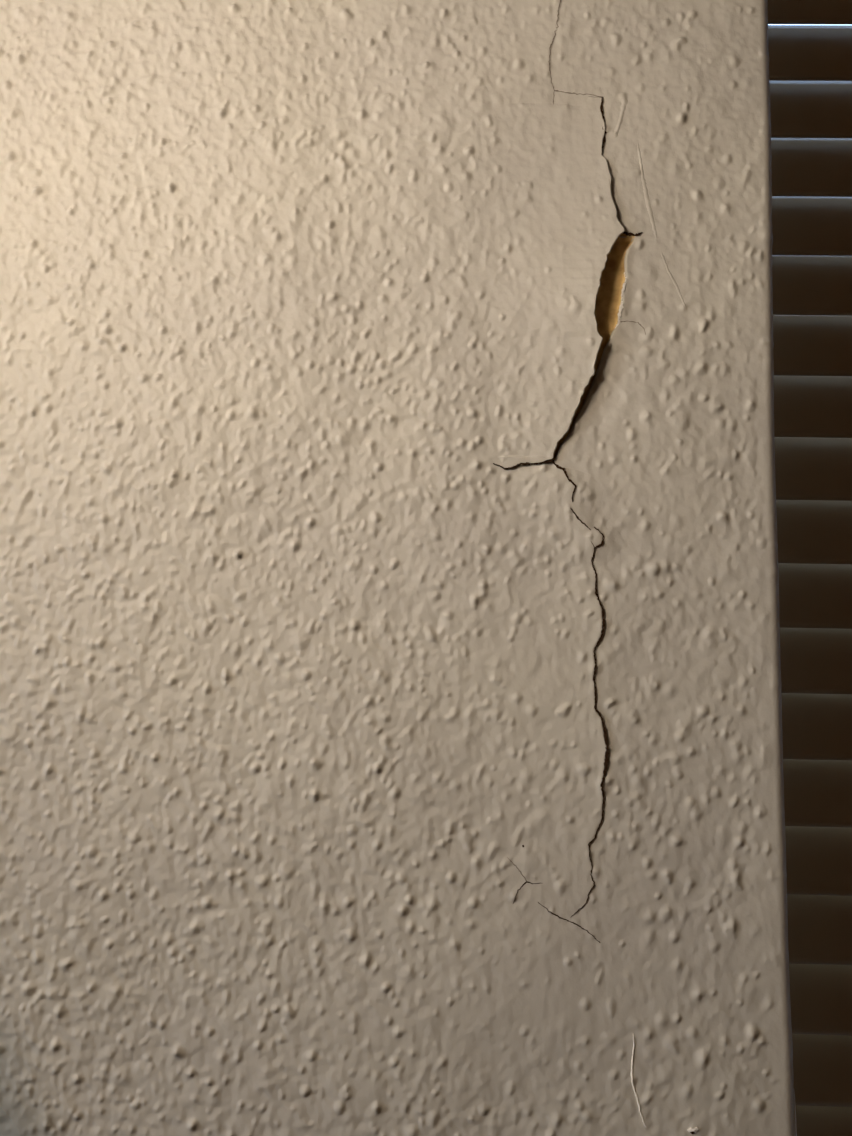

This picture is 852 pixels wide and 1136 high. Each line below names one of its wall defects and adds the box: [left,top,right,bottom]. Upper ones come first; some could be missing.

crack [548,0,607,152]
crack [623,229,643,237]
crack [493,459,609,943]